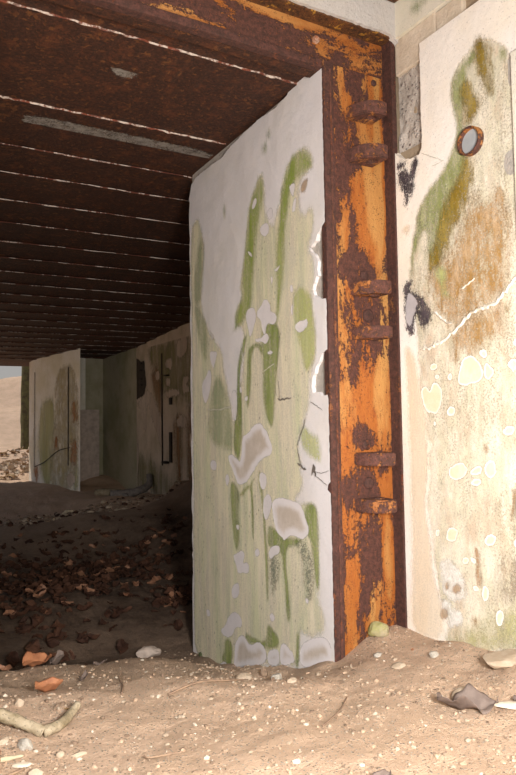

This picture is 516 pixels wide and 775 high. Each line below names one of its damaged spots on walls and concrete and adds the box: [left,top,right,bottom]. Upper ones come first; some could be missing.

spalling [398,64,422,153]
damp [396,156,418,206]
rust [428,188,512,360]
rust [173,408,192,481]
damp [191,150,324,664]
peeling [246,299,277,354]
spalling [315,359,325,395]
peeling [421,349,494,427]
damp [403,39,516,650]
crack [421,276,516,351]
peeling [225,423,309,559]
peeling [221,612,331,668]